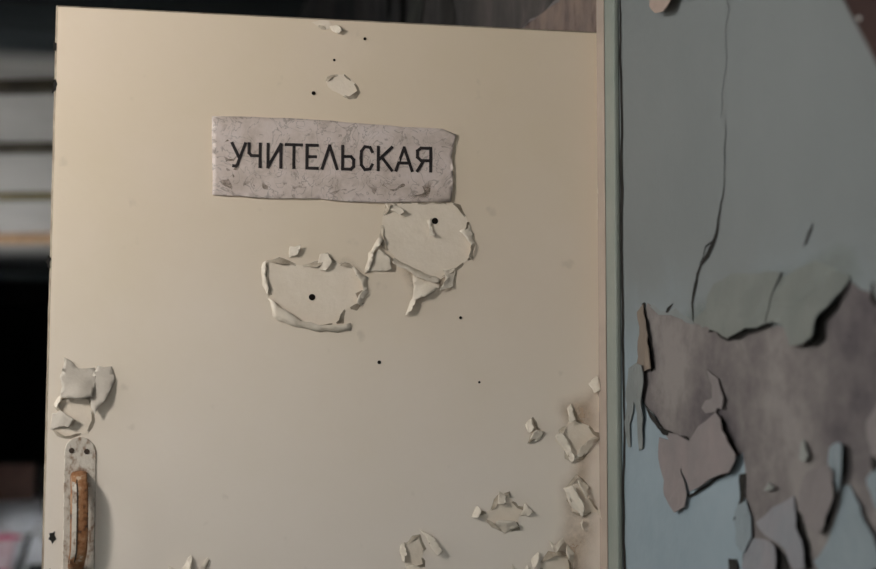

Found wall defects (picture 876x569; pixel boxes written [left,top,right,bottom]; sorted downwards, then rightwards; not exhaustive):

peeling [523,0,597,32]
peeling [649,0,671,13]
crack [666,2,730,323]
peeling [261,201,475,333]
peeling [50,358,115,439]
peeling [525,417,544,443]
peeling [555,404,600,463]
peeling [625,271,876,569]
peeling [472,491,533,533]
peeling [564,474,601,531]
peeling [400,530,443,569]
peeling [526,538,574,569]